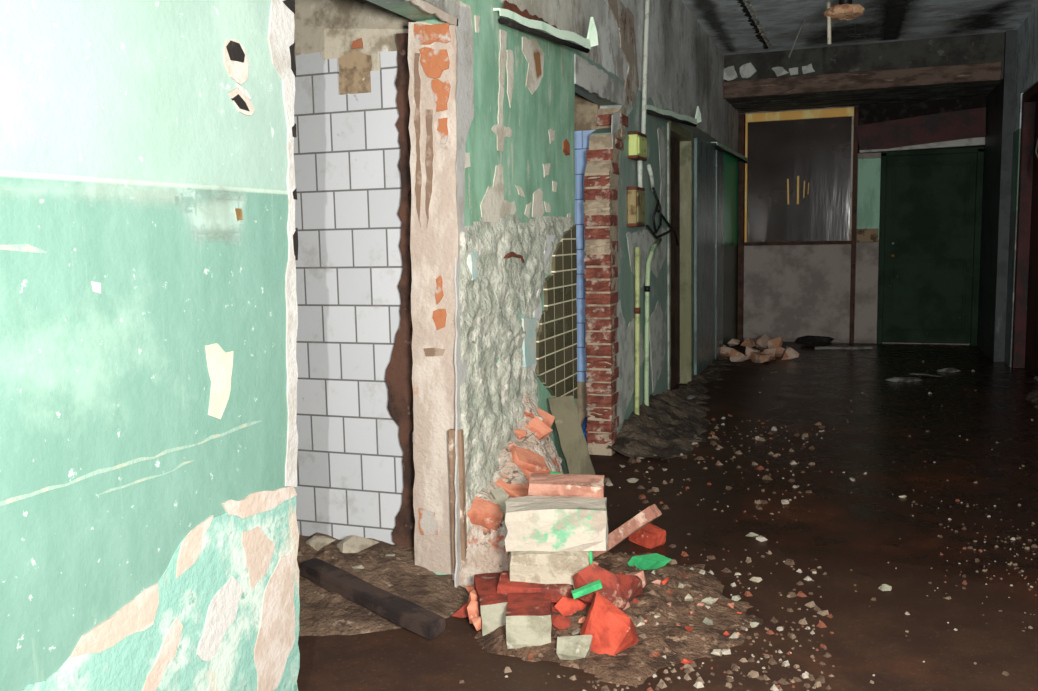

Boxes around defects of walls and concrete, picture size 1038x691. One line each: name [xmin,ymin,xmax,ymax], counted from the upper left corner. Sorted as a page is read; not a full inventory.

water stain [810,0,918,44]
water stain [952,1,1015,33]
peeling [338,38,372,94]
spalling [405,0,480,226]
flaking render [459,0,667,541]
flaking render [432,275,447,330]
peeling [22,0,300,691]
spalling [424,348,445,357]